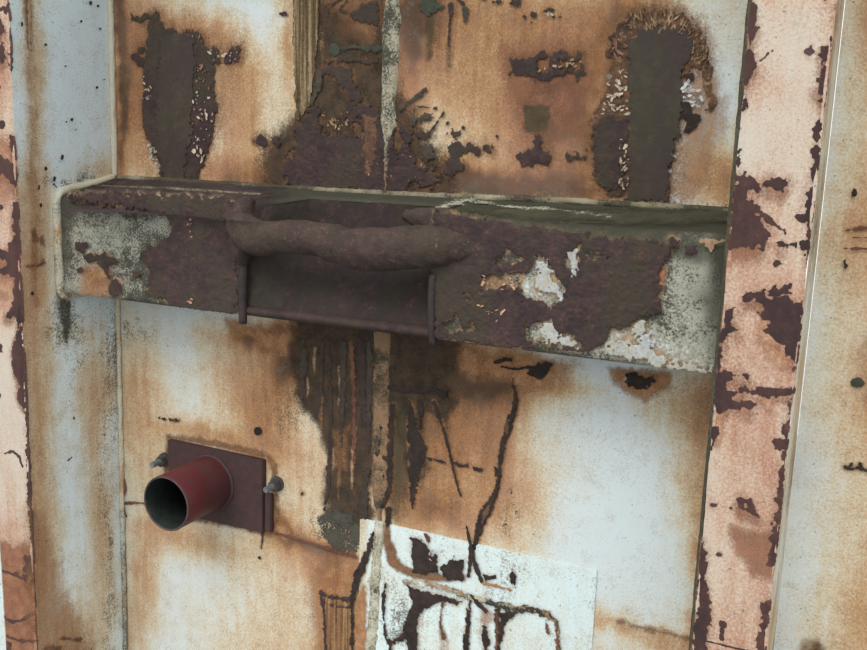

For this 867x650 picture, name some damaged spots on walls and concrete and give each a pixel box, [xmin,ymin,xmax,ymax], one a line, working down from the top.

peeling [585,7,717,203]
corrosion [60,0,499,528]
peeling [529,257,565,301]
peeling [567,246,580,277]
peeling [668,236,725,256]
peeling [540,321,579,350]
peeling [605,319,713,373]
corrosion [383,208,672,582]